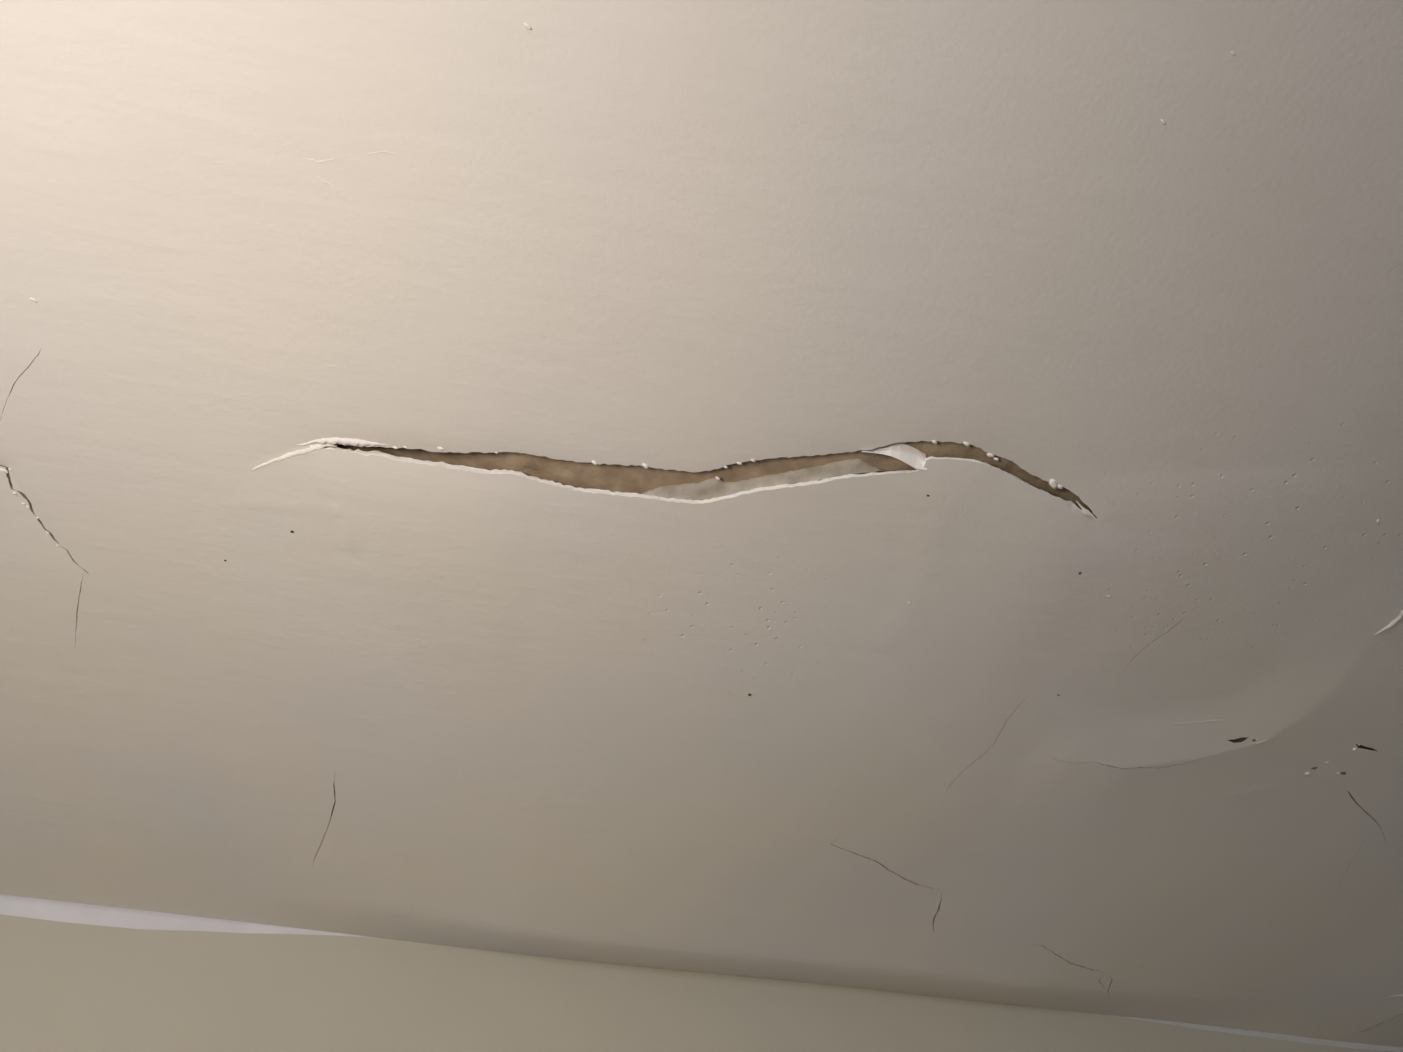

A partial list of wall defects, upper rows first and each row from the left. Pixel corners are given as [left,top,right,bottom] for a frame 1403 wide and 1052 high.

crack [0,352,40,419]
crack [252,437,1099,521]
crack [0,465,88,642]